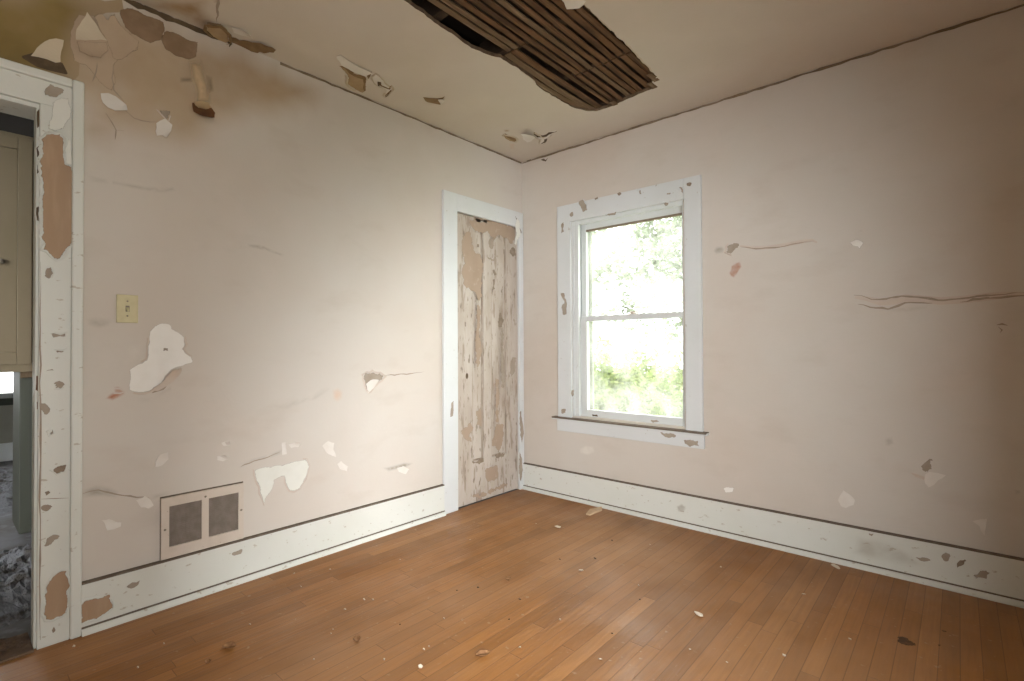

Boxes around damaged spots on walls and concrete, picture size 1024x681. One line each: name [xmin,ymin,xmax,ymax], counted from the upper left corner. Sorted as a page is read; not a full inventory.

peeling [31,8,276,111]
peeling [336,55,395,98]
spalling [411,0,659,111]
peeling [156,110,172,138]
peeling [502,129,557,150]
peeling [35,84,72,278]
crack [740,239,817,250]
peeling [129,323,193,395]
peeling [361,370,387,394]
peeling [253,442,310,505]
peeling [40,569,115,633]